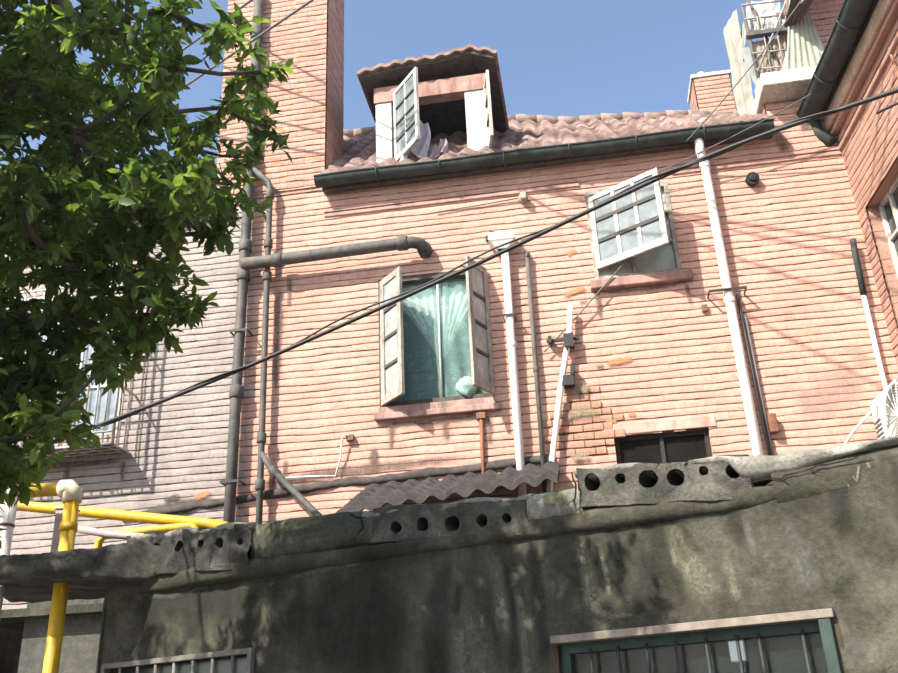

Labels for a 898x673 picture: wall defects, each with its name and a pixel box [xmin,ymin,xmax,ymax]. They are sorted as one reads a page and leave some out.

leakage [273,279,291,381]
leakage [577,544,655,619]